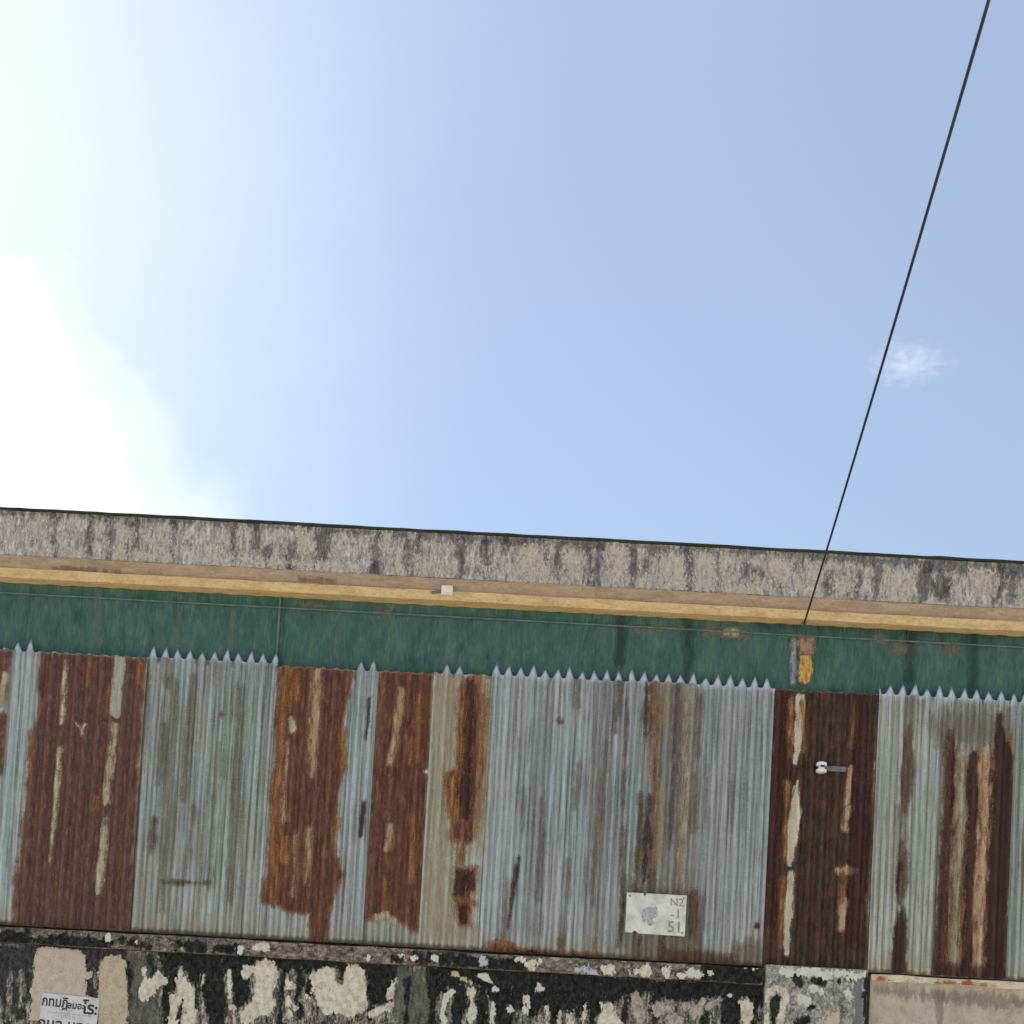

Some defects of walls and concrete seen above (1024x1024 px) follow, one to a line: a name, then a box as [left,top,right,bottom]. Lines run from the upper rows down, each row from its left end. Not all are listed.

corrosion [12,651,149,931]
peeling [28,932,205,1024]
corrosion [259,665,356,942]
peeling [227,941,398,1024]
corrosion [358,670,434,935]
corrosion [443,674,490,928]
spalling [439,954,867,1024]
corrosion [754,636,879,970]
corrosion [933,713,1014,986]